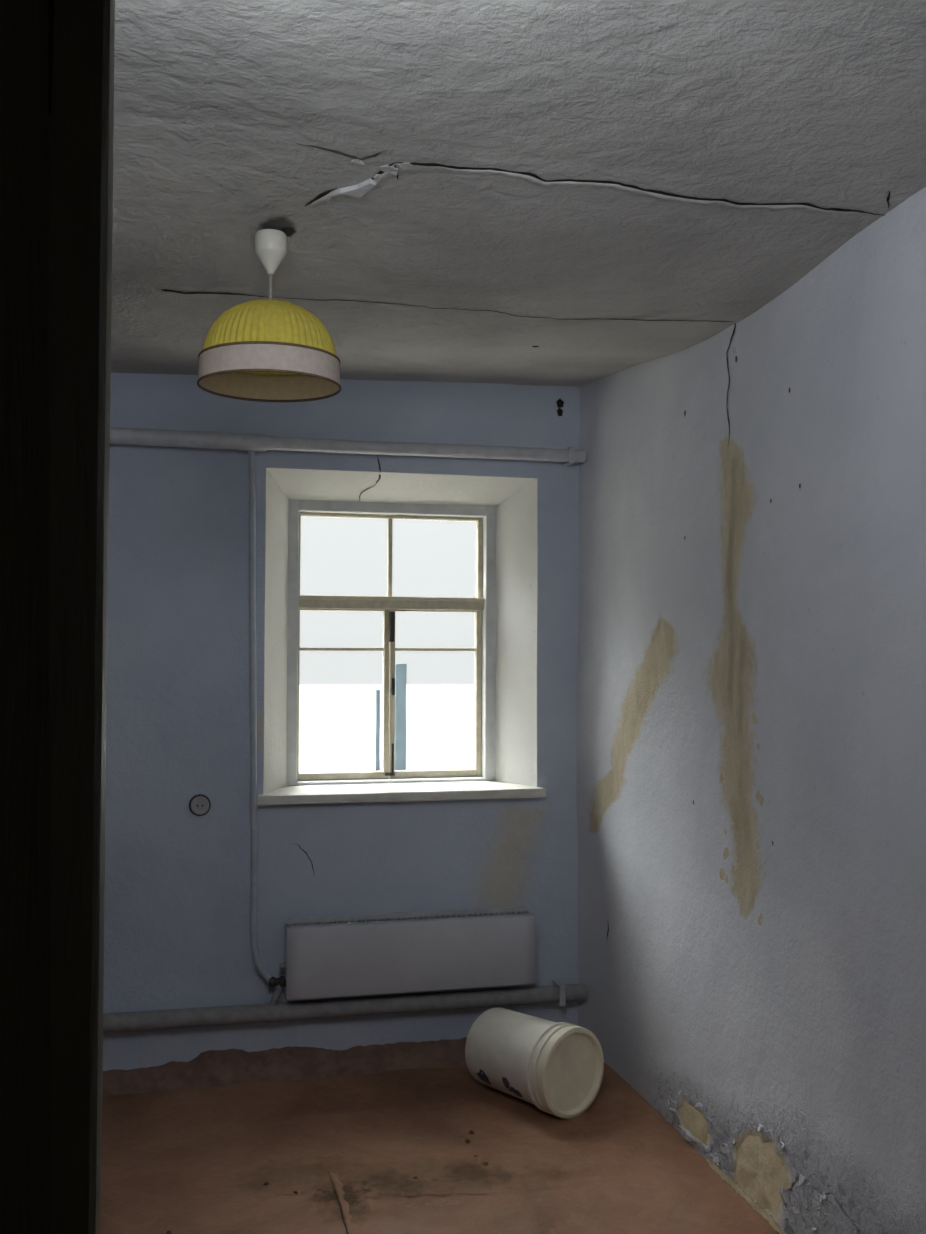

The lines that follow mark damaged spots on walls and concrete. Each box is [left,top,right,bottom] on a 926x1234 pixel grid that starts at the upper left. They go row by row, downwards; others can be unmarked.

crack [296,143,890,222]
water stain [584,616,683,836]
water stain [696,432,770,927]
flaking render [665,1089,859,1234]